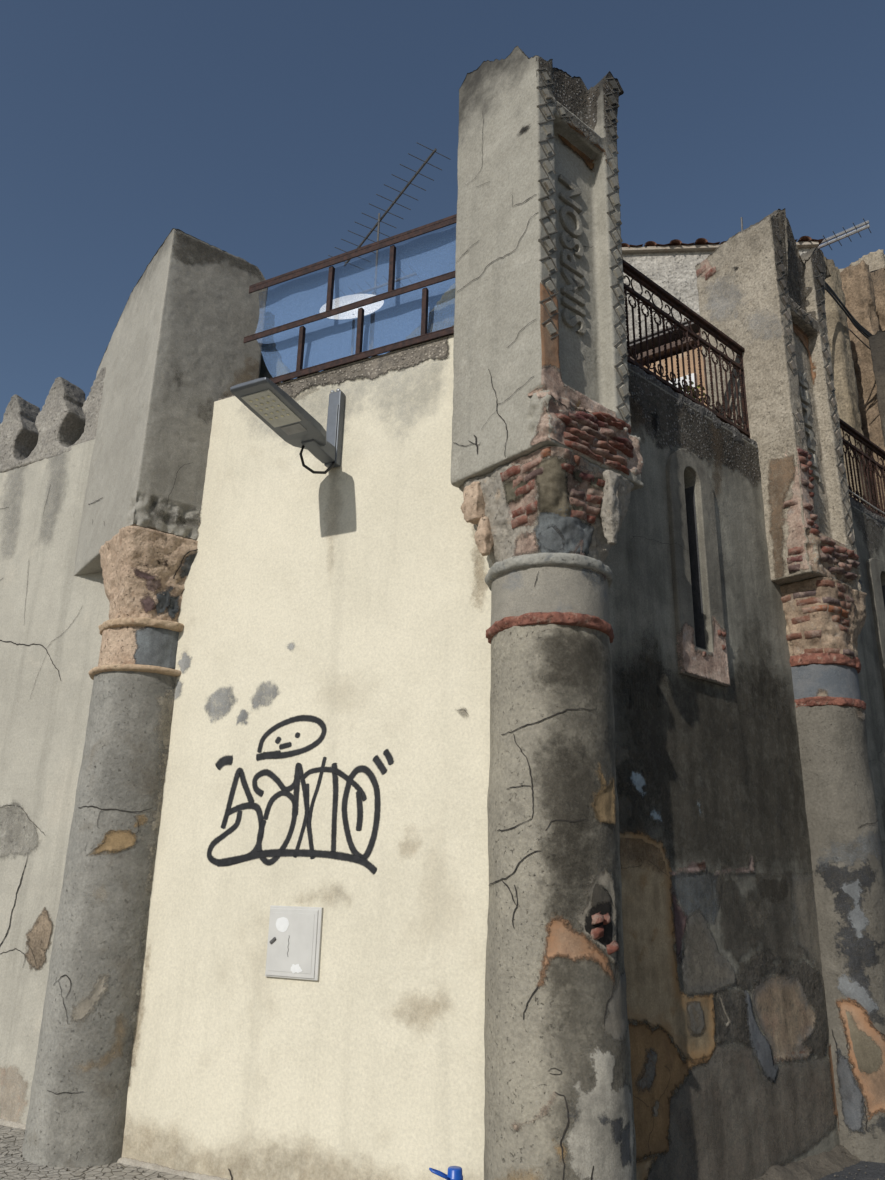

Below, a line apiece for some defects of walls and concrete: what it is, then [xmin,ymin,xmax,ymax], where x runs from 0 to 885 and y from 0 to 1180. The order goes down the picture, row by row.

flaking render [500,283,644,582]
flaking render [0,803,52,970]
crack [0,565,82,698]
flaking render [125,906,150,1063]
flaking render [86,549,198,891]
crack [489,708,596,928]
flaking render [523,764,885,1180]
damp [545,631,885,1180]
flaking render [768,446,862,658]